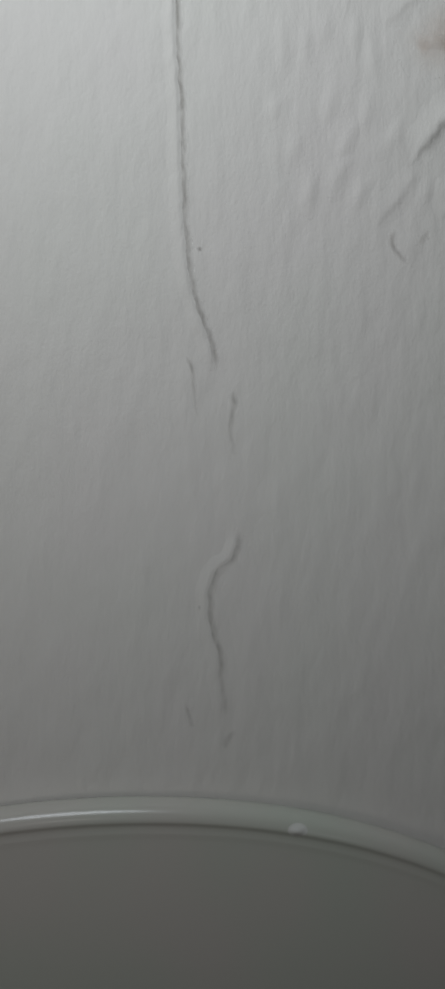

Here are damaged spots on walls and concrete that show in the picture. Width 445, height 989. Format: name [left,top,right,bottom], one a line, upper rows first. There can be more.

crack [160,0,220,371]